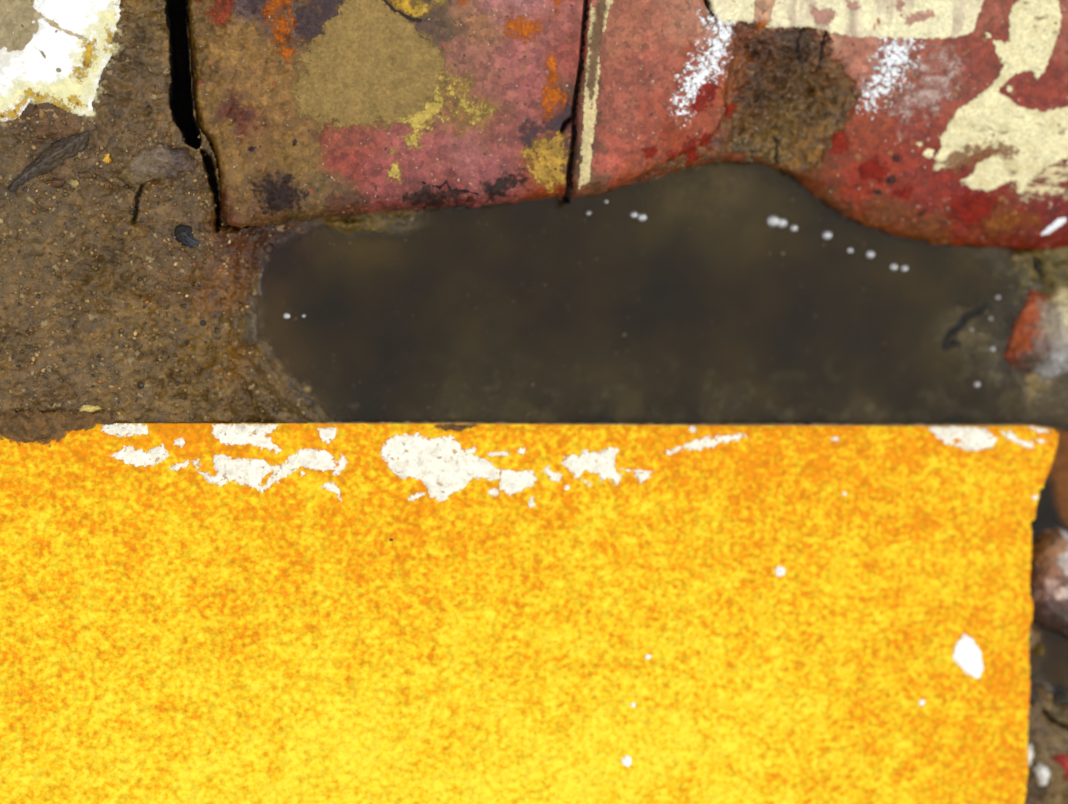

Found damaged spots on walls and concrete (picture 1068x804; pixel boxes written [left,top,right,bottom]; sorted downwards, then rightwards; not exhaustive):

crack [703,0,717,28]
peeling [896,0,936,26]
crack [165,0,221,231]
crack [560,0,589,204]
damp [663,9,738,127]
spalling [631,20,863,187]
damp [242,172,308,224]
damp [403,168,530,212]
peeling [101,423,348,501]
peeling [380,432,652,508]
peeling [666,426,749,455]
peeling [929,426,1048,451]